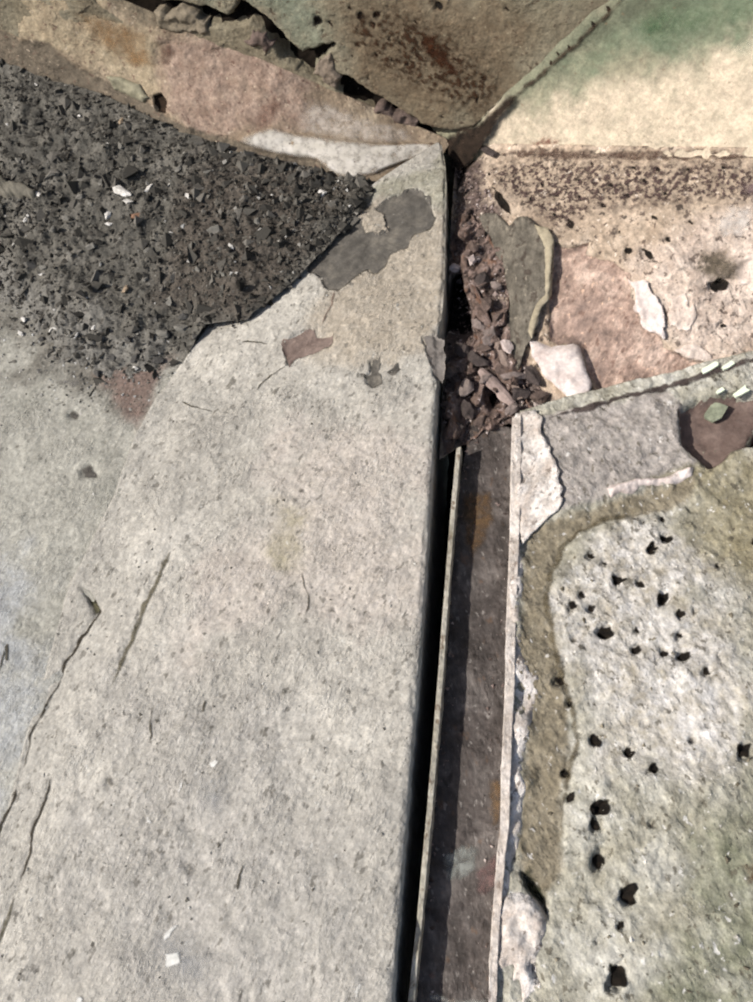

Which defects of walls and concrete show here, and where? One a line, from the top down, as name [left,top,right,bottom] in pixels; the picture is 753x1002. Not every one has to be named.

crack [127,0,335,67]
crack [341,75,398,109]
rust [351,14,495,106]
crack [473,0,621,126]
crack [418,122,437,134]
crack [114,554,169,679]
crack [0,644,8,668]
crack [24,596,101,766]
crack [0,790,16,831]
crack [21,782,50,877]
crack [0,903,12,940]